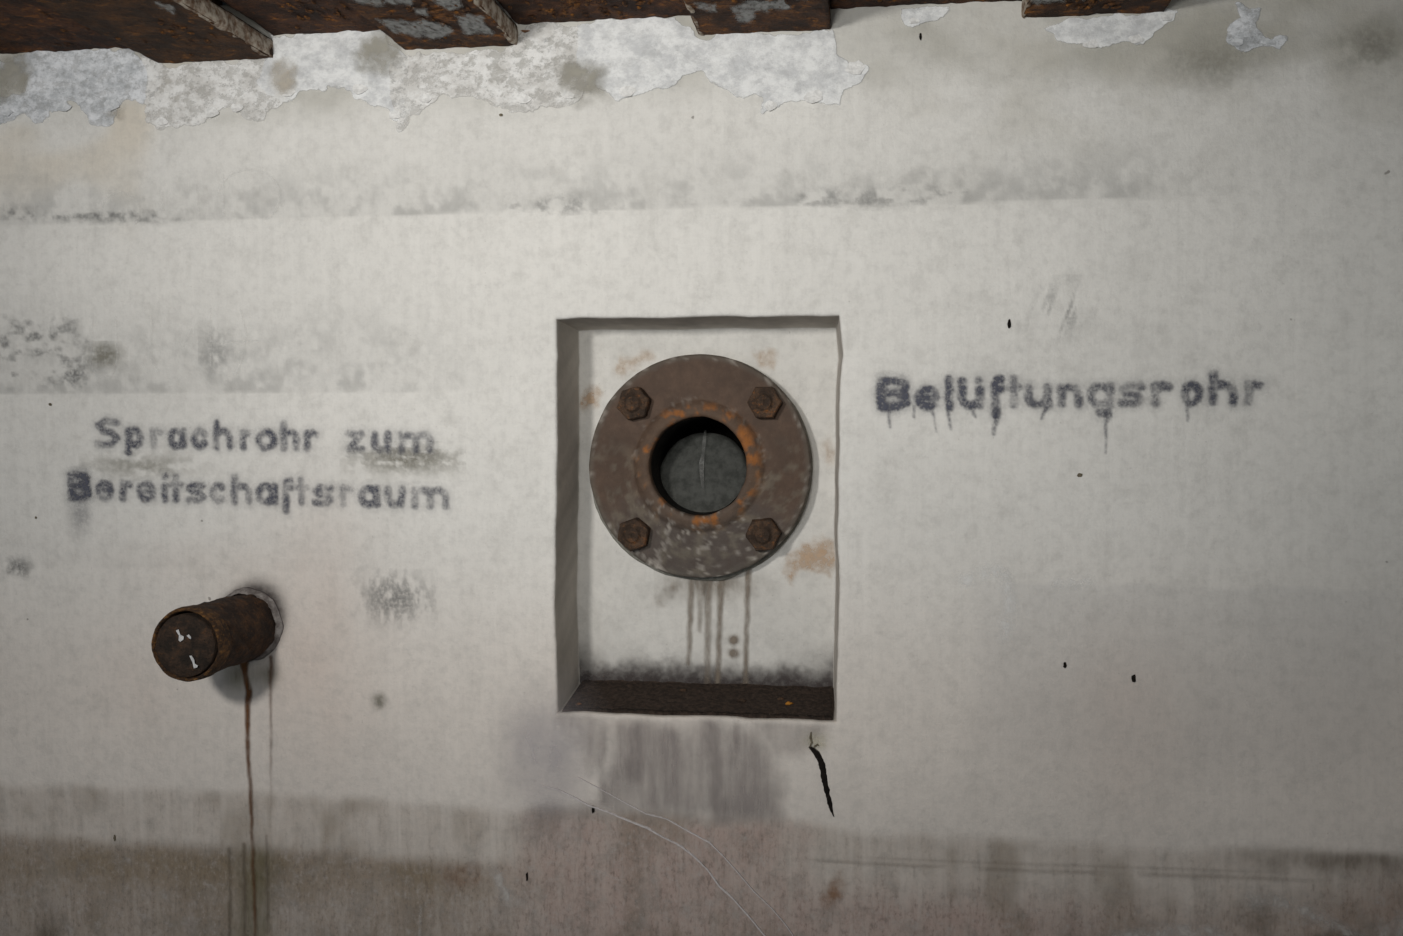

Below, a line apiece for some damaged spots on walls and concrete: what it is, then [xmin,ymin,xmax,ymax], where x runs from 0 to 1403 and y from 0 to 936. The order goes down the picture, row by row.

peeling [1045,8,1178,48]
peeling [1226,2,1288,52]
peeling [0,17,869,132]
corrosion [235,662,253,839]
crack [809,732,834,817]